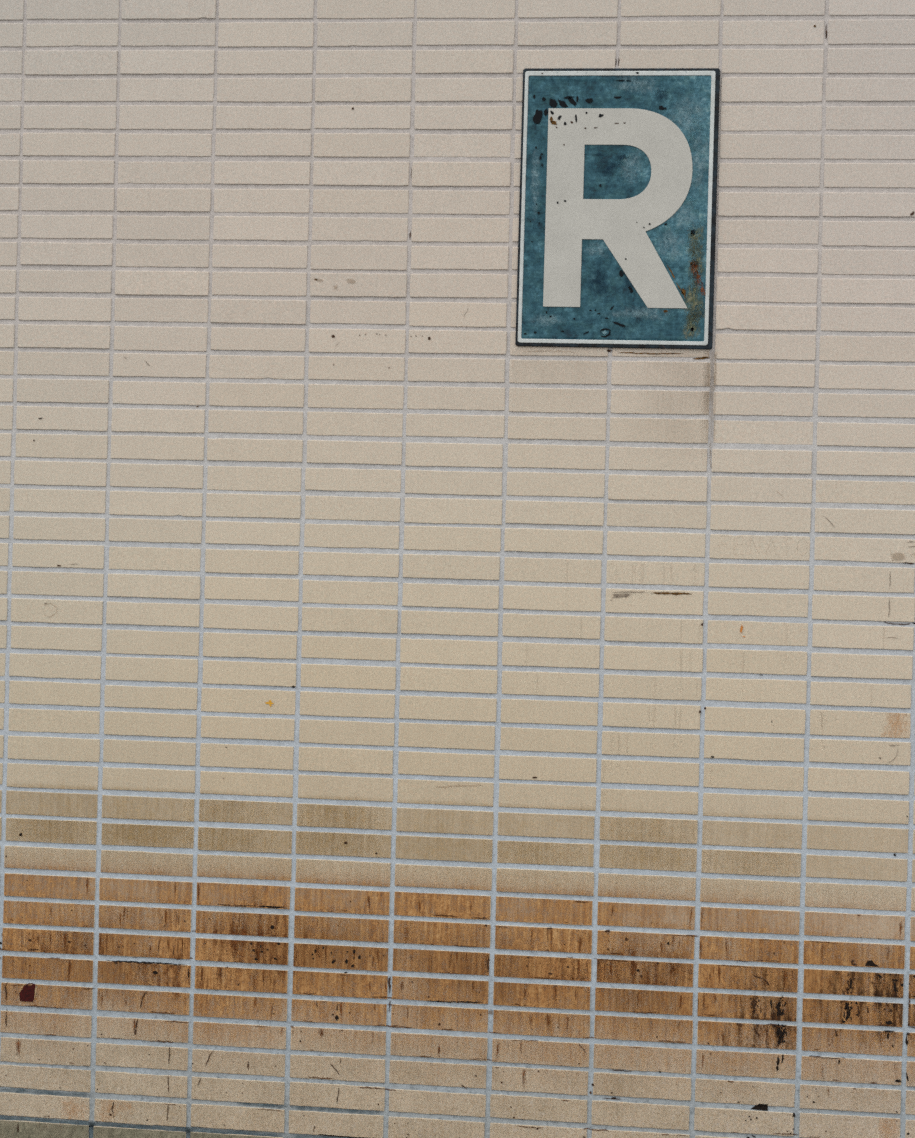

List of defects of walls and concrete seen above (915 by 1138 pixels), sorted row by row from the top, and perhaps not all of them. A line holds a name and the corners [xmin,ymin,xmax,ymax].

water stain [750,997,787,1071]
water stain [835,974,869,1036]